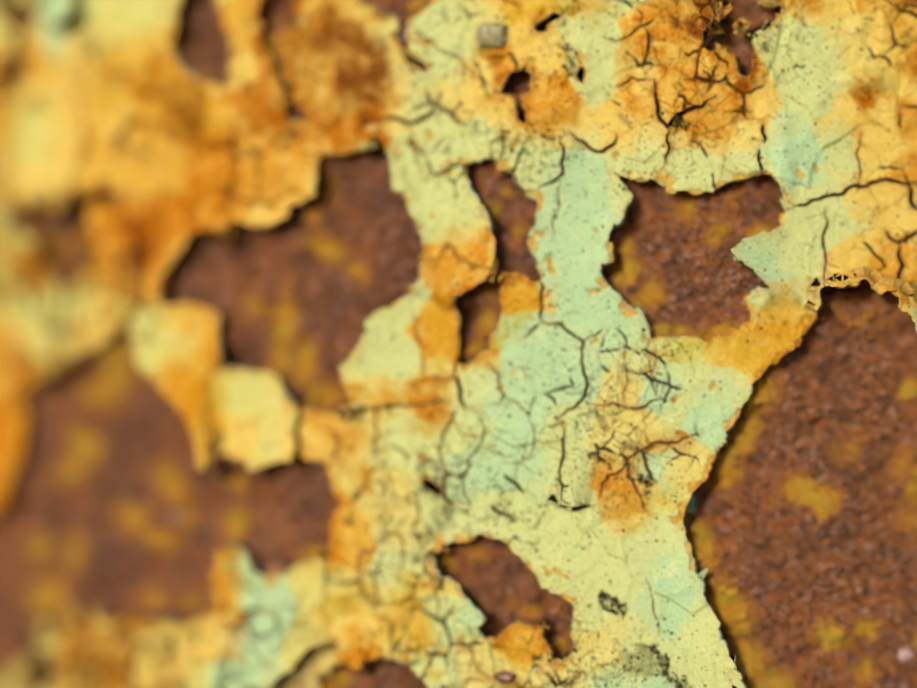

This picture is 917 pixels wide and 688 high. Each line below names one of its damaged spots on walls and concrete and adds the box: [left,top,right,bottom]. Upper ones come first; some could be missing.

peeling [173,0,231,88]
peeling [363,0,431,26]
peeling [535,11,561,32]
crack [615,9,653,53]
crack [357,106,460,176]
peeling [502,69,531,123]
crack [617,76,717,169]
crack [757,124,767,171]
peeling [0,98,604,688]
crack [352,309,535,503]
crack [525,280,701,512]
peeling [560,107,917,688]